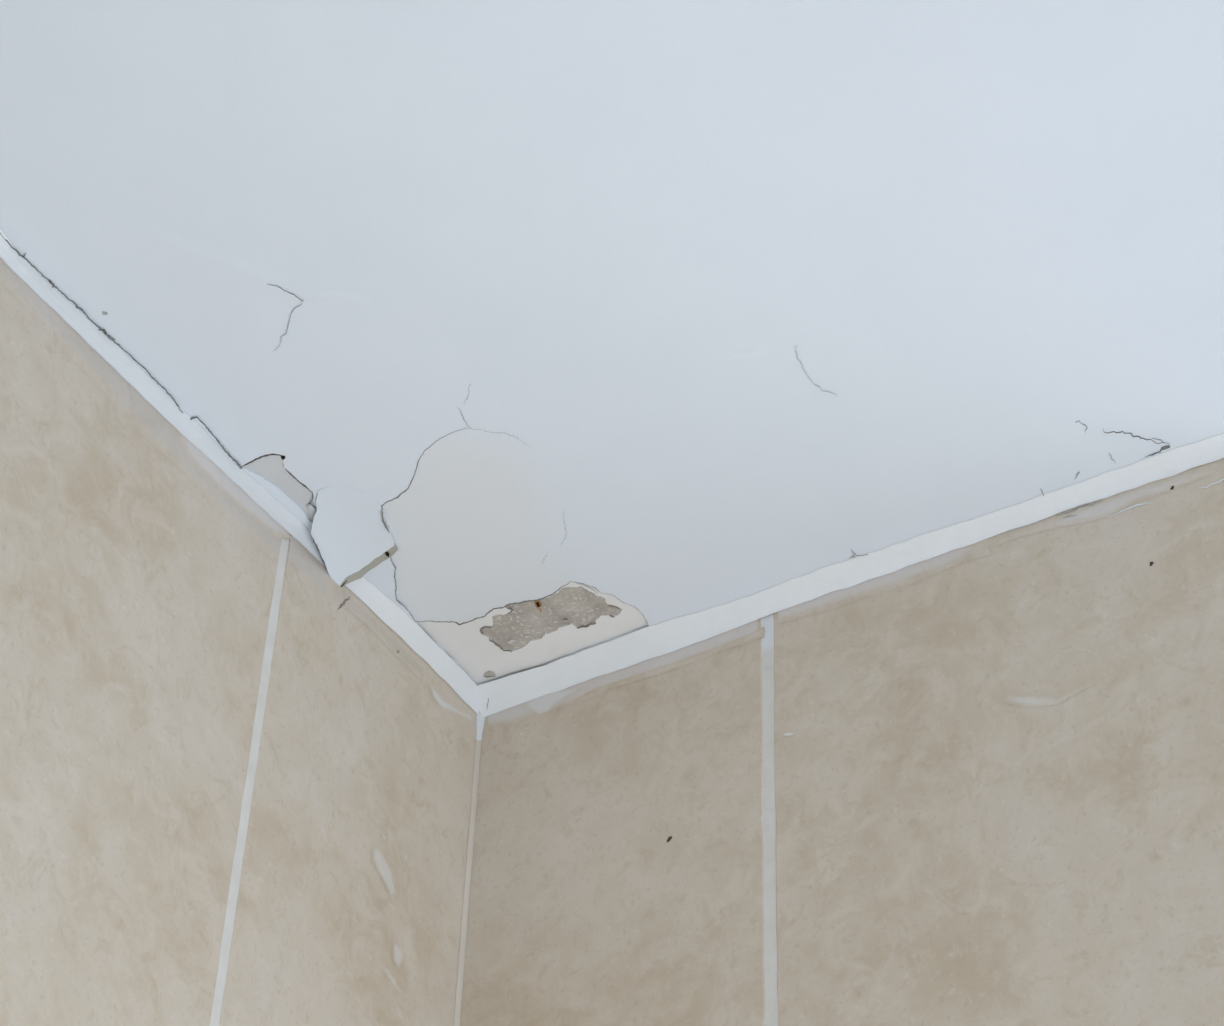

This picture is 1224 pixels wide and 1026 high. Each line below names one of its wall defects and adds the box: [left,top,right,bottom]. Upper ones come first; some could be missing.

crack [0,233,242,469]
crack [267,284,303,351]
peeling [242,428,649,684]
crack [1075,420,1170,464]